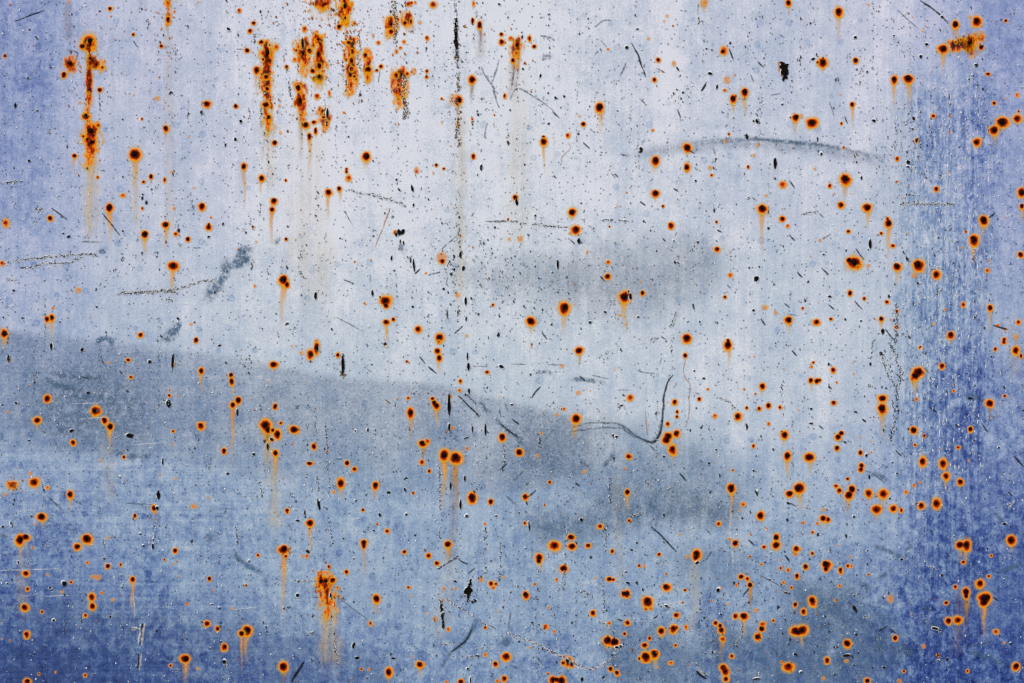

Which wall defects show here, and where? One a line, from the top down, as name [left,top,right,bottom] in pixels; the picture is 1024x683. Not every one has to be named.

rust [237,0,429,151]
rust [498,32,537,71]
rust [936,15,986,63]
rust [61,34,106,179]
rust [128,148,173,184]
rust [845,255,869,270]
rust [363,296,396,346]
rust [259,403,300,470]
rust [418,438,468,483]
rust [727,469,853,637]
rust [314,564,349,619]
rust [944,574,992,625]